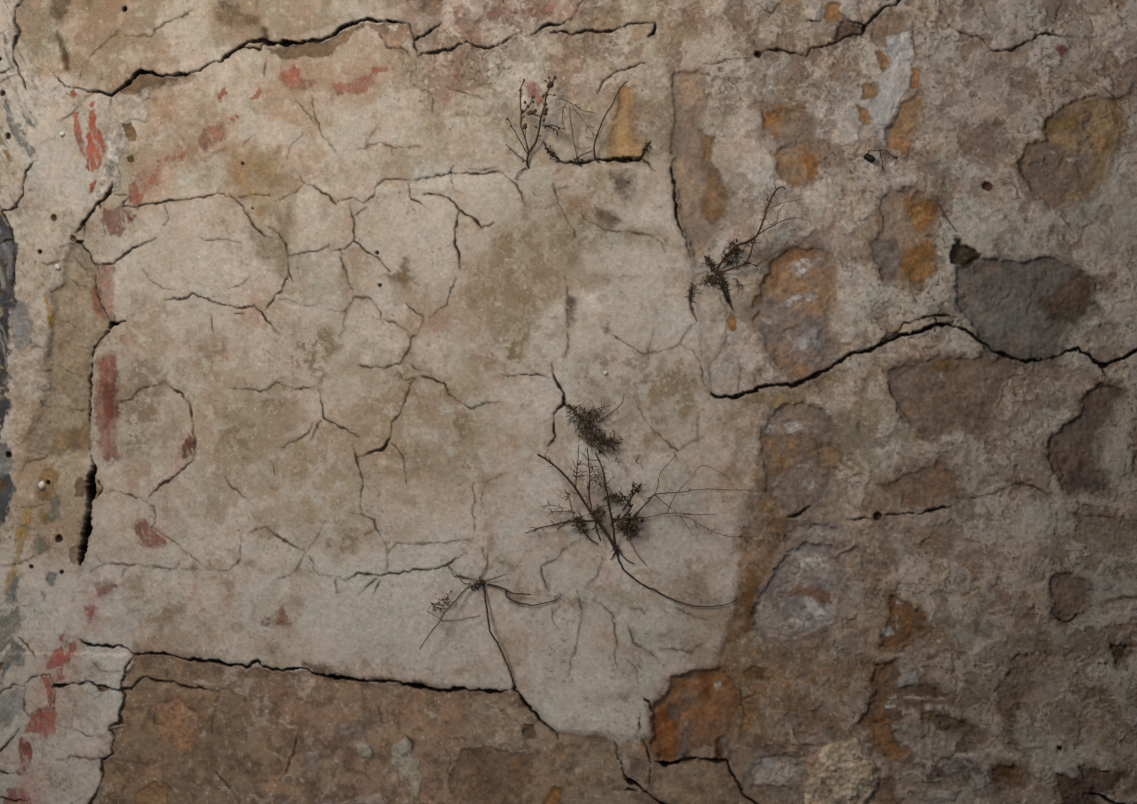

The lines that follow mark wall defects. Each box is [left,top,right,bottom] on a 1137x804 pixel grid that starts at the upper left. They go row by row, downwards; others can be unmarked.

crack [58,18,509,118]
crack [538,10,656,94]
crack [554,141,690,251]
spalling [1013,92,1123,210]
crack [69,166,523,592]
crack [521,373,570,446]
spalling [749,245,836,383]
crack [700,314,1137,399]
spalling [868,184,1097,438]
spalling [1046,382,1124,496]
spalling [741,522,848,640]
spalling [649,665,765,804]